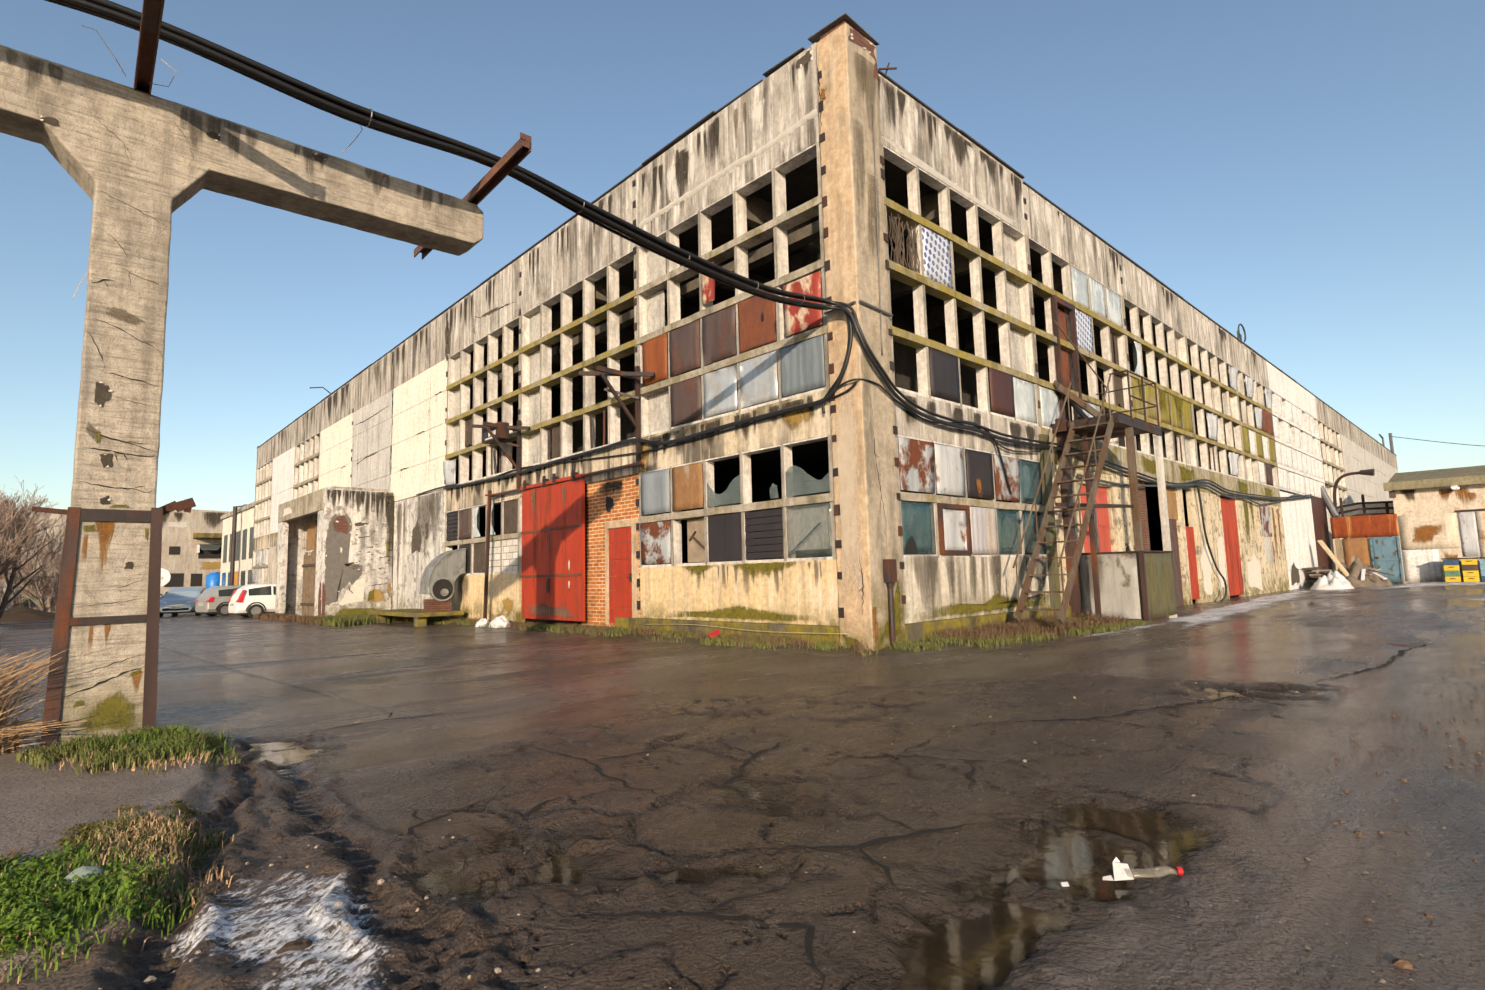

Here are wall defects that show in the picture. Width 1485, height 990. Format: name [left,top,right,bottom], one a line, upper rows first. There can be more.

water stain [181,107,256,152]
water stain [295,145,328,173]
water stain [366,169,390,191]
water stain [642,99,764,207]
water stain [856,55,1118,274]
crack [88,191,170,407]
crack [79,425,155,493]
rust [82,521,114,564]
spalling [318,512,390,616]
spalling [411,521,429,554]
crack [498,750,658,835]
crack [859,848,910,896]